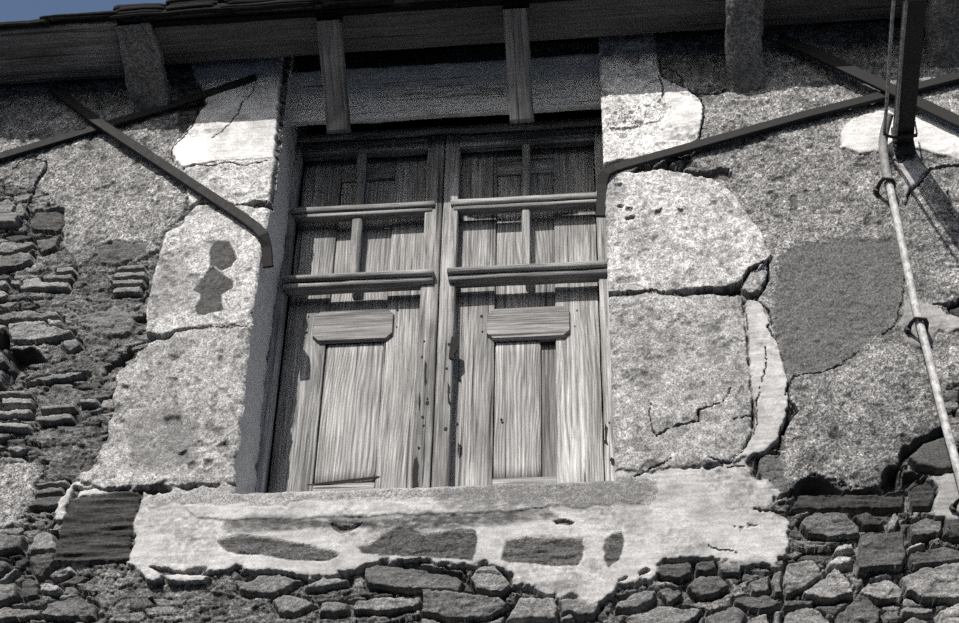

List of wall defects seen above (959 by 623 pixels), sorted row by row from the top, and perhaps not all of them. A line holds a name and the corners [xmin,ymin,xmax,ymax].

crack [171,81,272,170]
crack [882,276,906,335]
peeling [0,327,52,390]
crack [623,258,859,468]
spalling [164,394,183,431]
spalling [177,438,230,471]
crack [634,457,672,477]
spalling [150,478,167,493]
flaking render [331,522,363,534]
flaking render [554,518,575,526]
flaking render [141,565,218,584]